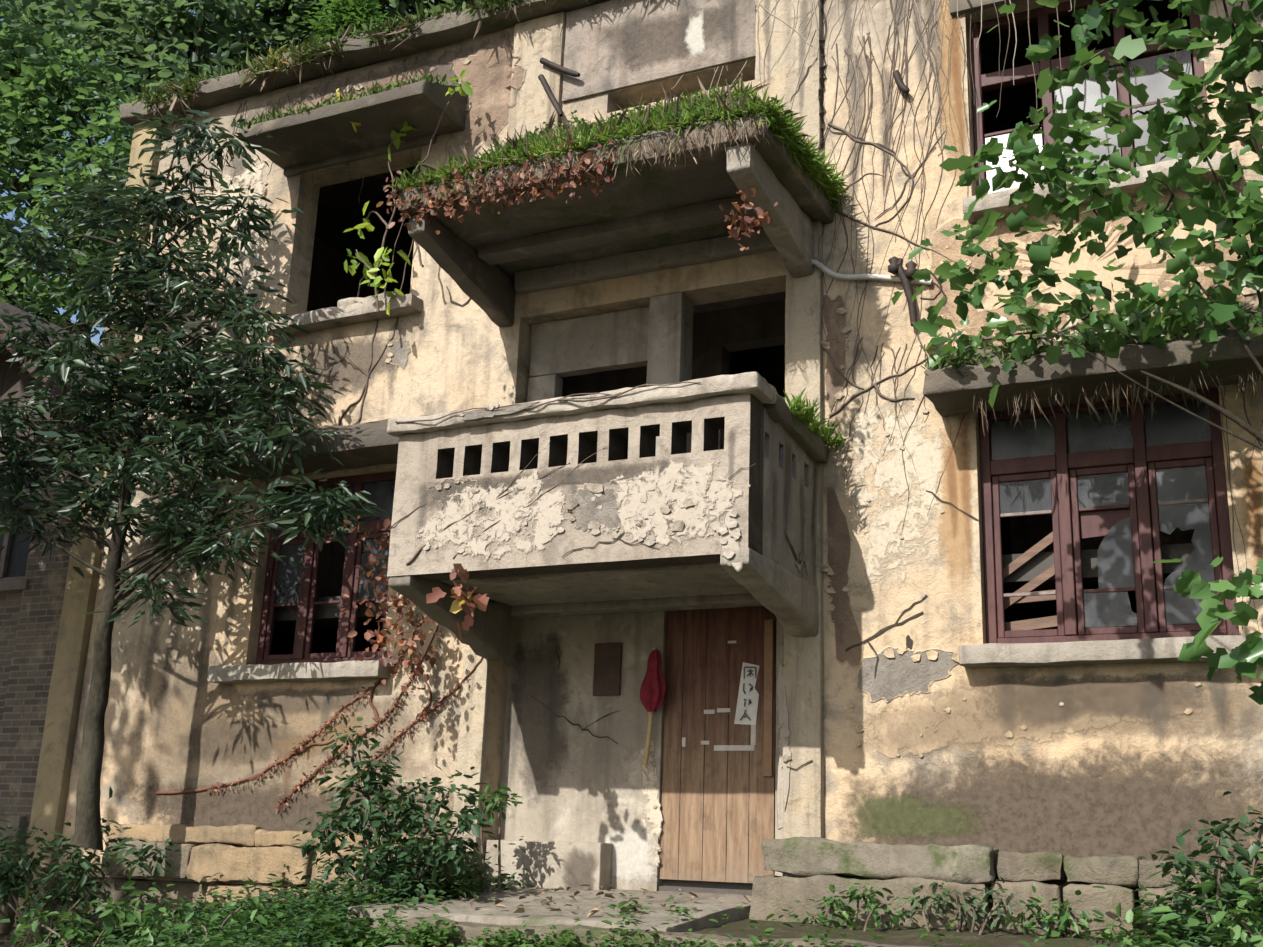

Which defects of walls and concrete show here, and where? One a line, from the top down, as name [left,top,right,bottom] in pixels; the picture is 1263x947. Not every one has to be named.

crack [790,0,936,219]
spalling [819,294,851,412]
peeling [417,460,750,572]
flaking render [819,388,1203,758]
water stain [185,689,365,762]
water stain [995,675,1187,724]
water stain [134,784,454,851]
water stain [851,745,1263,878]
water stain [1041,873,1090,886]